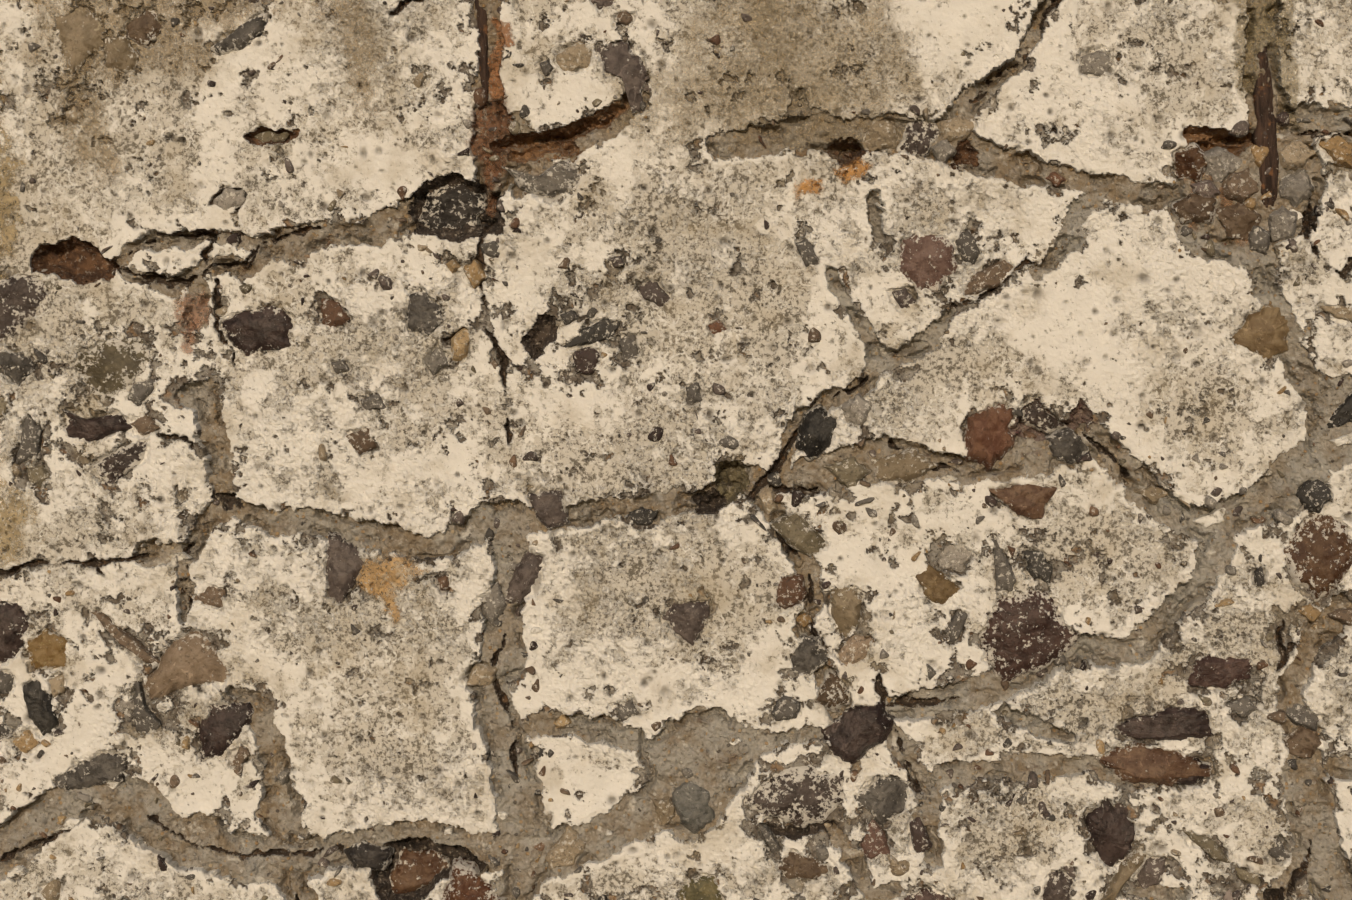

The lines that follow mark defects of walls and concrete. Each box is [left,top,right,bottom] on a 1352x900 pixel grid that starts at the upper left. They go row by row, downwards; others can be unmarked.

corrosion [469,18,515,215]
crack [112,188,321,365]
crack [443,222,513,444]
crack [1298,198,1352,279]
crack [0,552,150,576]
flaking render [0,378,852,900]
crack [745,372,869,667]
flaking render [706,0,1352,868]
flaking render [825,823,911,900]
crack [874,673,959,794]
flaking render [1127,881,1189,900]
flaking render [1256,726,1352,900]